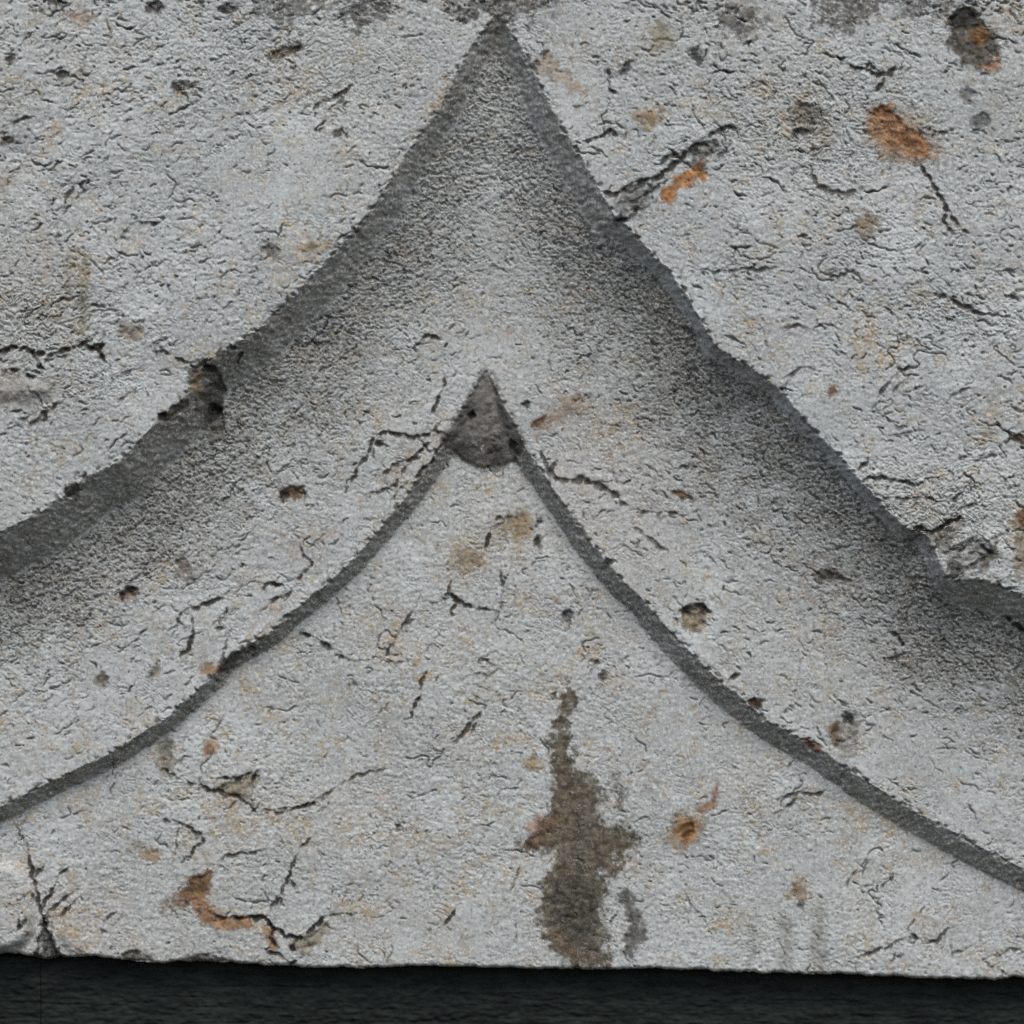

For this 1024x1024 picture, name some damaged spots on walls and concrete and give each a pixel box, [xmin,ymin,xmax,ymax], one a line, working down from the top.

crack [604,124,736,219]
corrosion [661,160,707,204]
corrosion [867,103,936,160]
crack [0,339,149,400]
spalling [158,359,227,442]
crack [346,377,446,498]
crack [163,768,384,815]
damp [516,688,648,969]
corrosion [675,790,718,848]
crack [17,831,75,929]
corrosion [166,870,277,950]
crack [208,839,353,965]